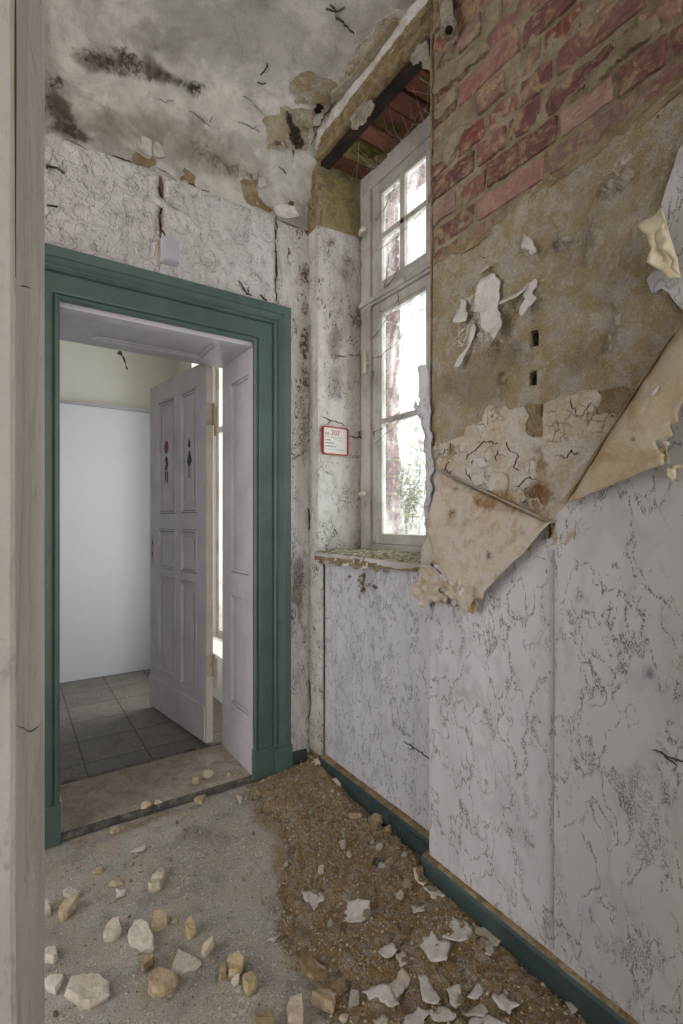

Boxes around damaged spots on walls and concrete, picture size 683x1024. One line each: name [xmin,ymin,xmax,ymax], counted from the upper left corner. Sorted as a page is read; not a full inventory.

water stain [85,48,204,94]
water stain [48,75,86,141]
spalling [131,136,166,168]
crack [272,217,280,300]
flaking render [240,0,683,558]
water stain [300,328,309,387]
peeling [319,559,381,572]
crack [653,749,683,766]